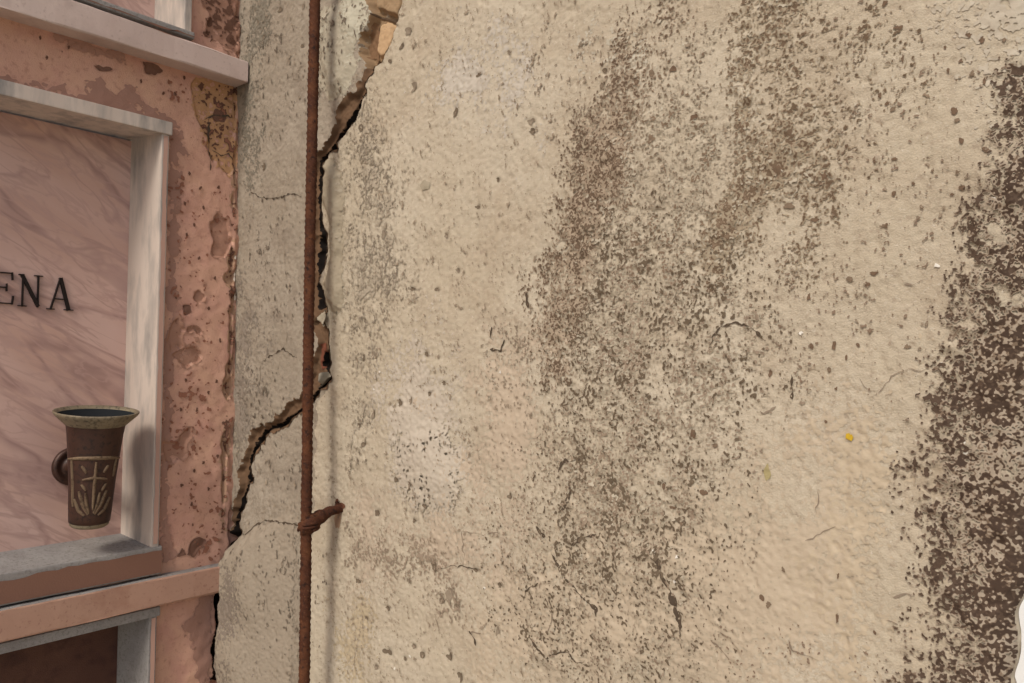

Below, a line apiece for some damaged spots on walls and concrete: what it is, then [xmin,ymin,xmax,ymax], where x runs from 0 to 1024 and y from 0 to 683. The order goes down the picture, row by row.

crack [370,13,399,23]
spalling [357,0,412,69]
peeling [161,76,238,567]
crack [230,62,381,546]
leakage [311,0,1024,683]